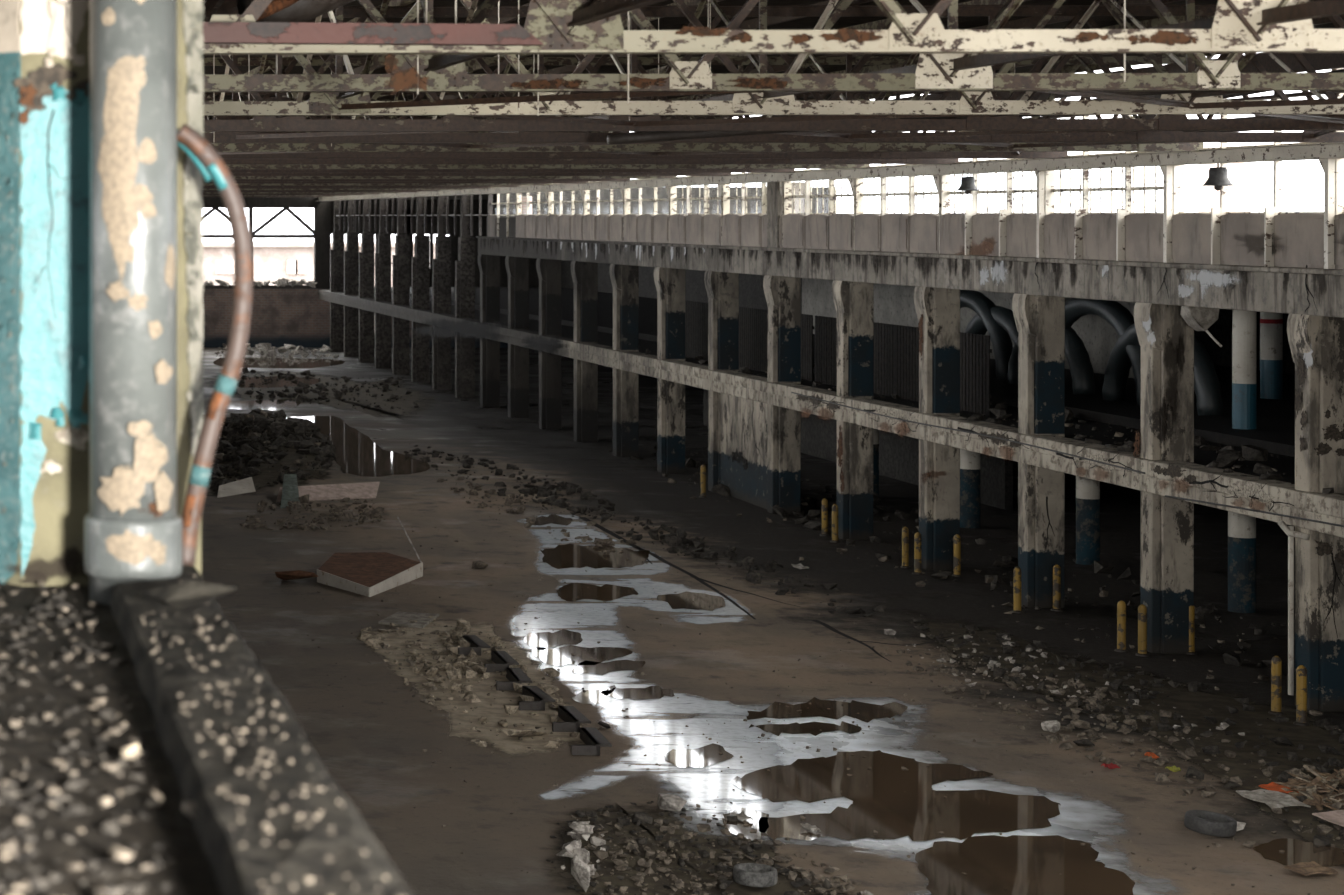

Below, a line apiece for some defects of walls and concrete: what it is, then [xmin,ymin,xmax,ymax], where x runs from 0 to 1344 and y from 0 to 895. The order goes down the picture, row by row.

rust [675,26,753,43]
rust [789,28,883,44]
peeling [0,0,163,584]
spalling [1180,306,1222,347]
spalling [1294,346,1344,456]
peeling [97,420,196,566]